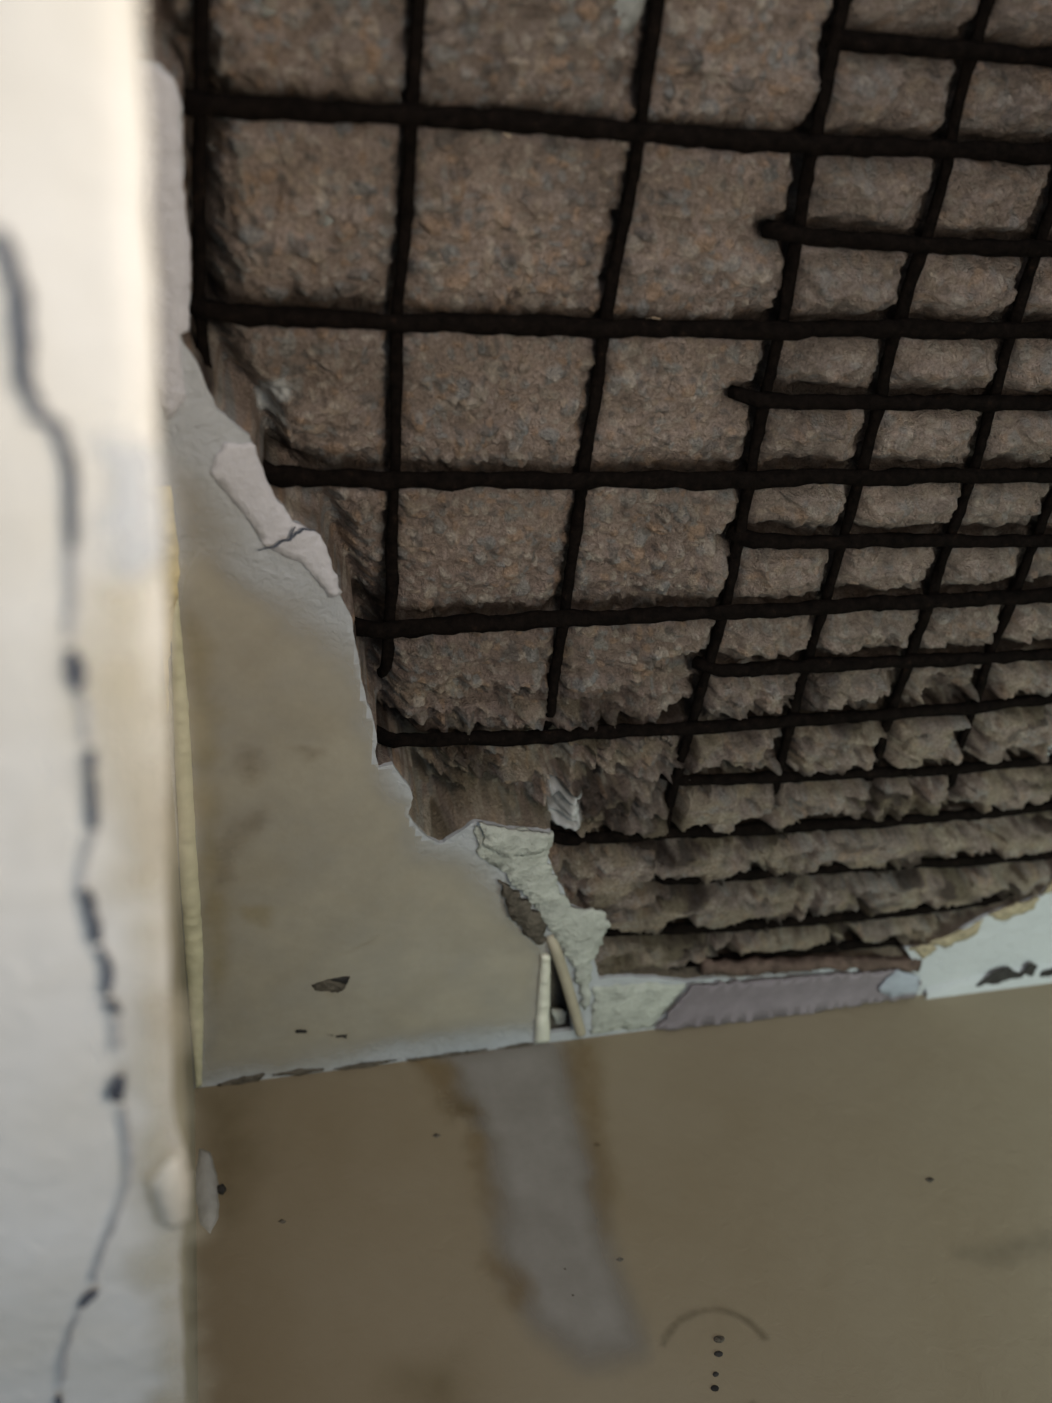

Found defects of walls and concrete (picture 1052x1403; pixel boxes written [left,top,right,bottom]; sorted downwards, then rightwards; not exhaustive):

crack [0,229,134,1403]
peeling [217,1042,535,1086]
spalling [140,0,1052,1034]